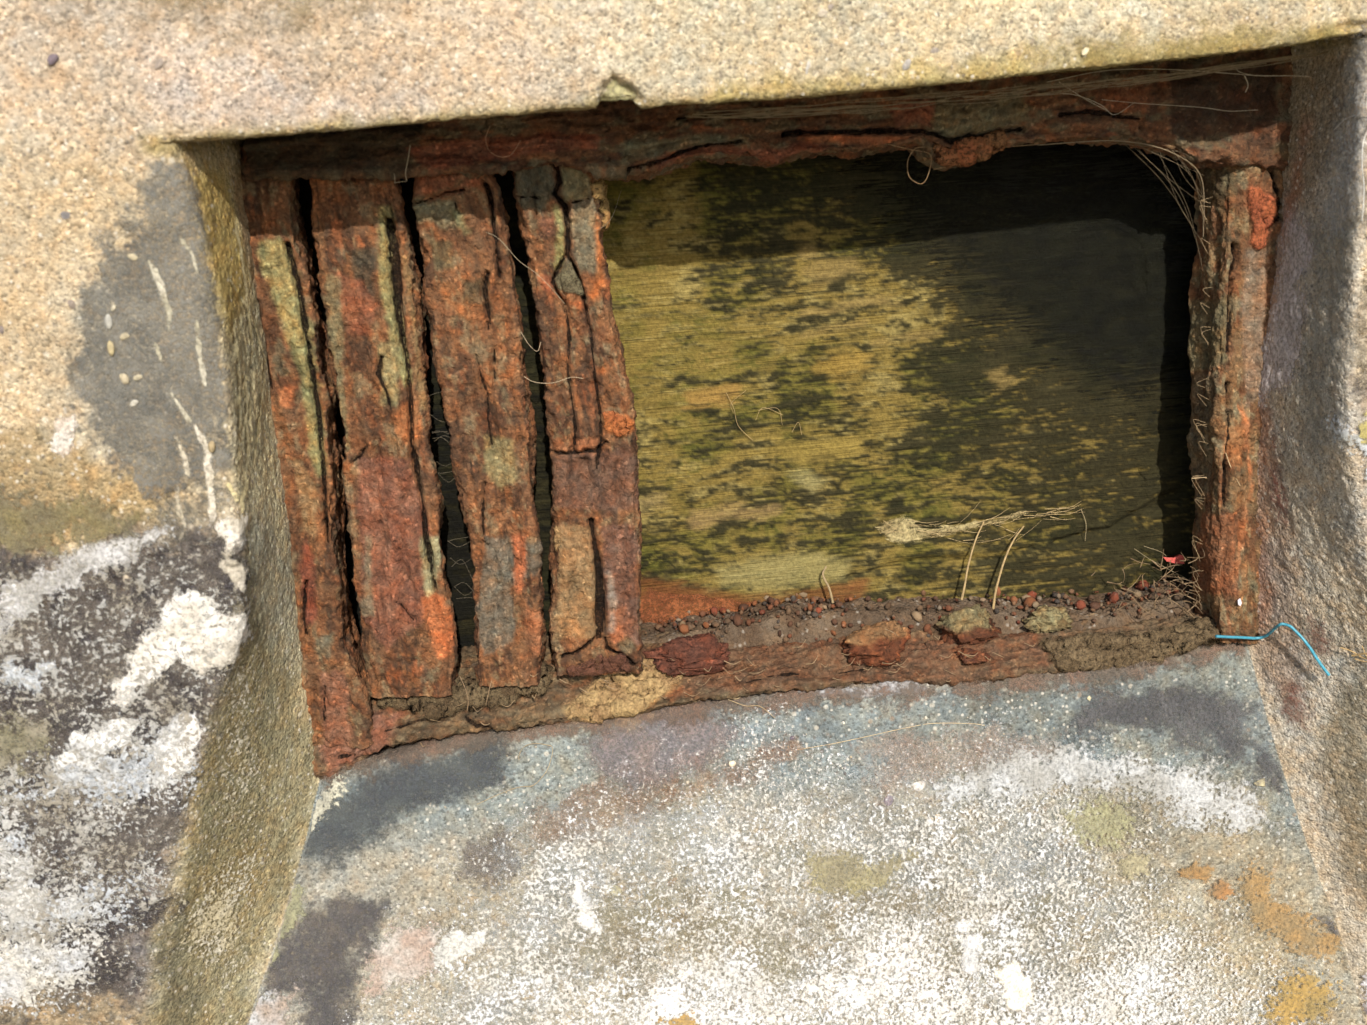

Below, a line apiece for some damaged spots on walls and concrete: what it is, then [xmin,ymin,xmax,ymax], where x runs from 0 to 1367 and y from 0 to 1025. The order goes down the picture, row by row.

corrosion [933,129,1007,168]
corrosion [590,179,610,231]
corrosion [1248,187,1277,250]
corrosion [555,261,584,296]
water stain [50,160,266,544]
corrosion [602,410,631,437]
corrosion [552,526,561,552]
corrosion [639,588,752,624]
corrosion [566,653,683,724]
water stain [305,737,506,869]
water stain [460,834,520,889]
water stain [258,896,389,1025]